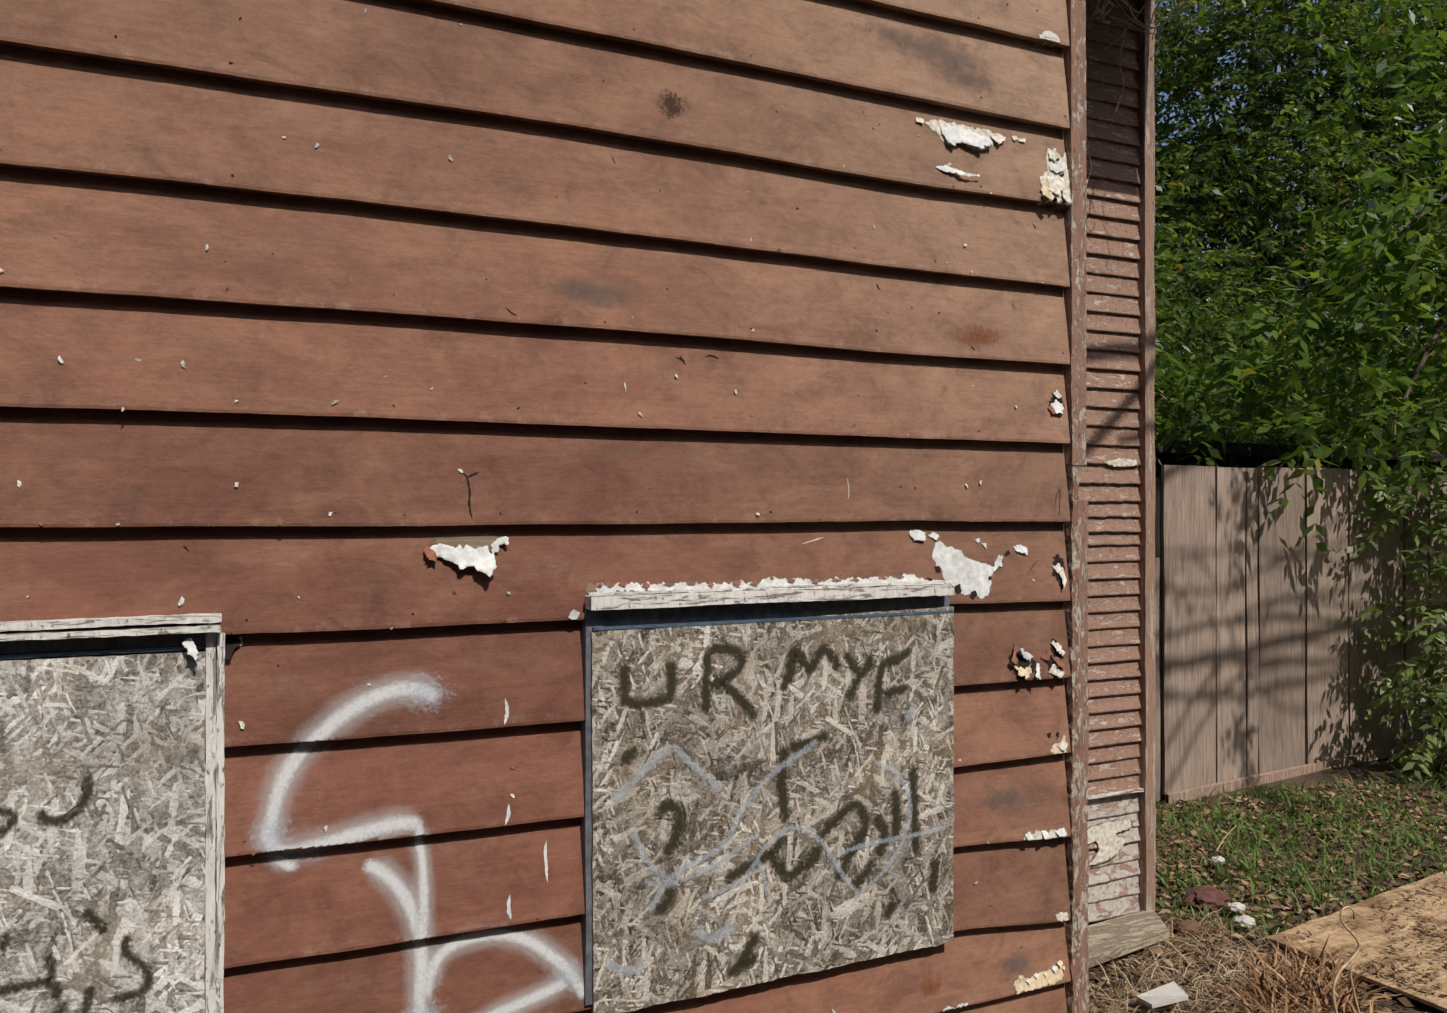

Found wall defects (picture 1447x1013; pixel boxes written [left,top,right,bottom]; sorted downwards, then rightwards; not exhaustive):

peeling [916,117,1026,187]
peeling [1037,147,1072,213]
peeling [424,531,509,577]
peeling [585,529,1028,599]
peeling [1008,638,1066,680]
peeling [1021,827,1068,841]
peeling [1012,960,1065,994]